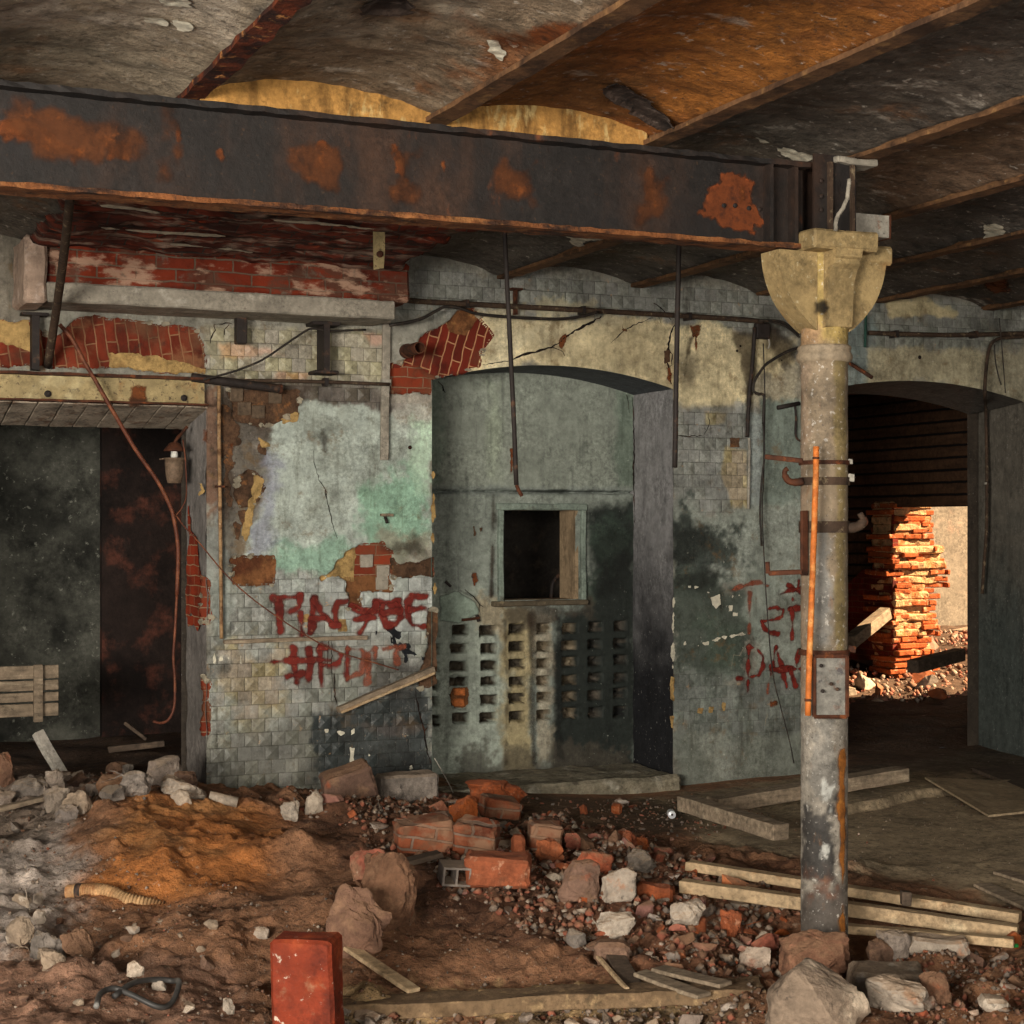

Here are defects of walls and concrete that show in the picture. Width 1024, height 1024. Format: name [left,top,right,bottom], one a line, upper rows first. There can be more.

corrosion [0,107,142,161]
spalling [20,199,480,271]
corrosion [495,164,529,198]
corrosion [698,172,764,235]
flaking render [0,314,207,375]
flaking render [390,308,494,395]
crack [487,303,675,384]
peeling [221,388,303,541]
crack [313,451,337,537]
peeling [228,553,276,587]
flaking render [319,541,439,692]
corrosion [836,748,846,881]